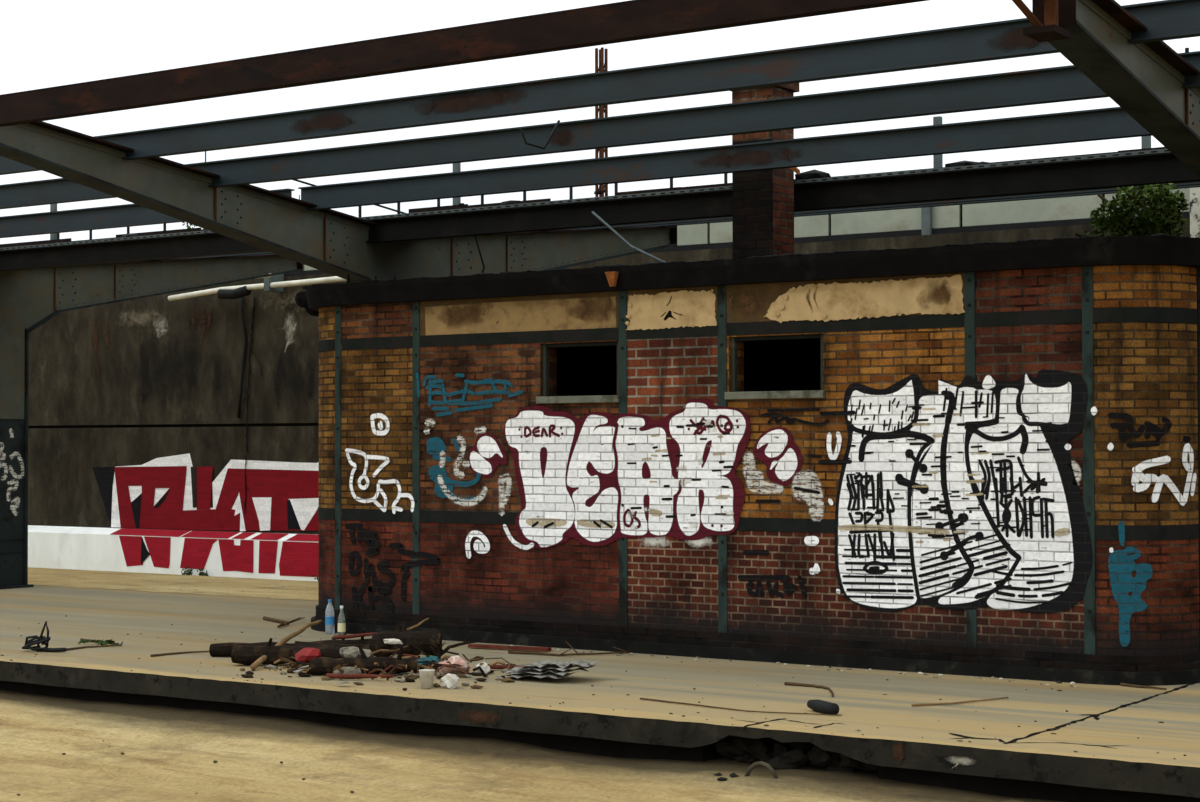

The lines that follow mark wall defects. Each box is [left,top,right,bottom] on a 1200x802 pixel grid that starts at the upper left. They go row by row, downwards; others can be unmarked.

peeling [625,289,717,330]
peeling [763,275,965,323]
crack [948,683,1195,748]